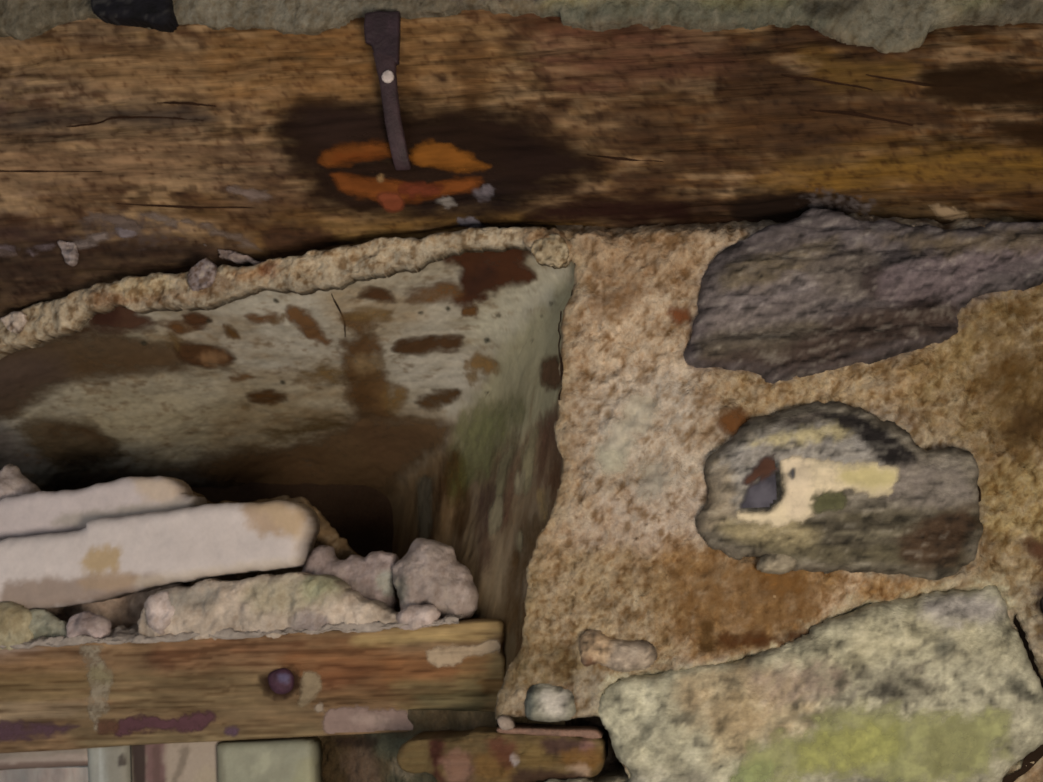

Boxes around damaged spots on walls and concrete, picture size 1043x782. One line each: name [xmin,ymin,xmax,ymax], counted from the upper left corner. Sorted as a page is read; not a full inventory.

rust [319,143,489,212]
leakage [274,93,690,228]